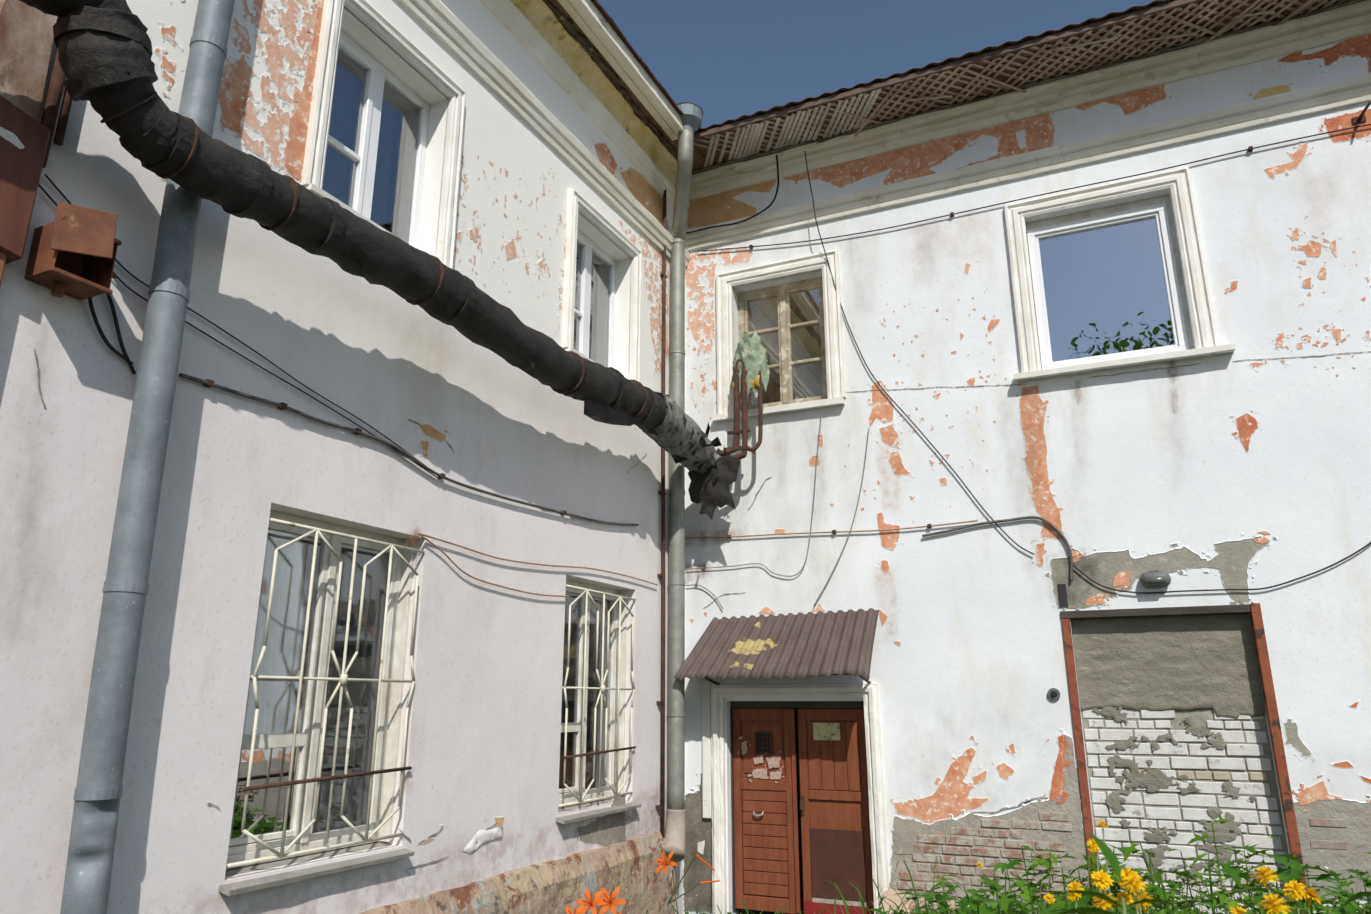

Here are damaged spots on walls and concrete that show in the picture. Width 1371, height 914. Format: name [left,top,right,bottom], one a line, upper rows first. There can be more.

peeling [454,154,567,336]
peeling [592,140,668,230]
peeling [616,218,759,419]
peeling [687,112,1060,230]
peeling [861,379,953,575]
flaking render [951,261,1278,611]
peeling [1247,310,1371,386]
peeling [1248,34,1371,100]
peeling [1263,107,1371,180]
peeling [1286,216,1371,306]
flaking render [888,728,1093,904]
flaking render [1279,716,1371,906]